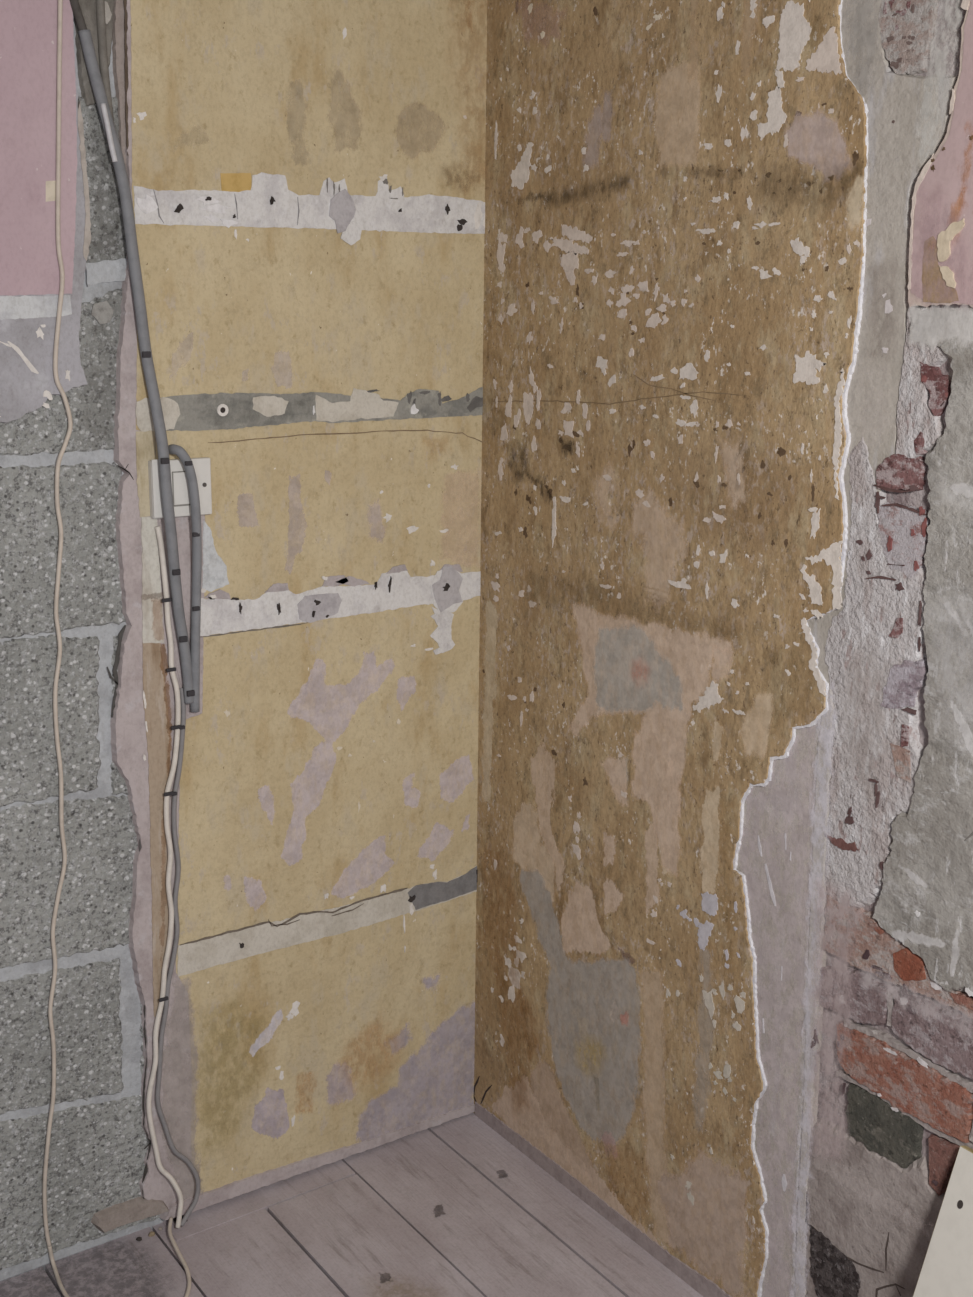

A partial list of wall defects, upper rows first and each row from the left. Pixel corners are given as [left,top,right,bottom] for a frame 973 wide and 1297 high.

peeling [704,0,842,150]
peeling [497,224,701,357]
peeling [907,153,965,303]
peeling [493,367,542,452]
peeling [514,390,590,548]
flaking render [650,350,931,696]
flaking render [920,362,952,416]
flaking render [880,601,929,784]
flaking render [824,807,859,852]
crack [180,888,408,945]
flaking render [811,895,973,1196]
spalling [809,1225,861,1297]